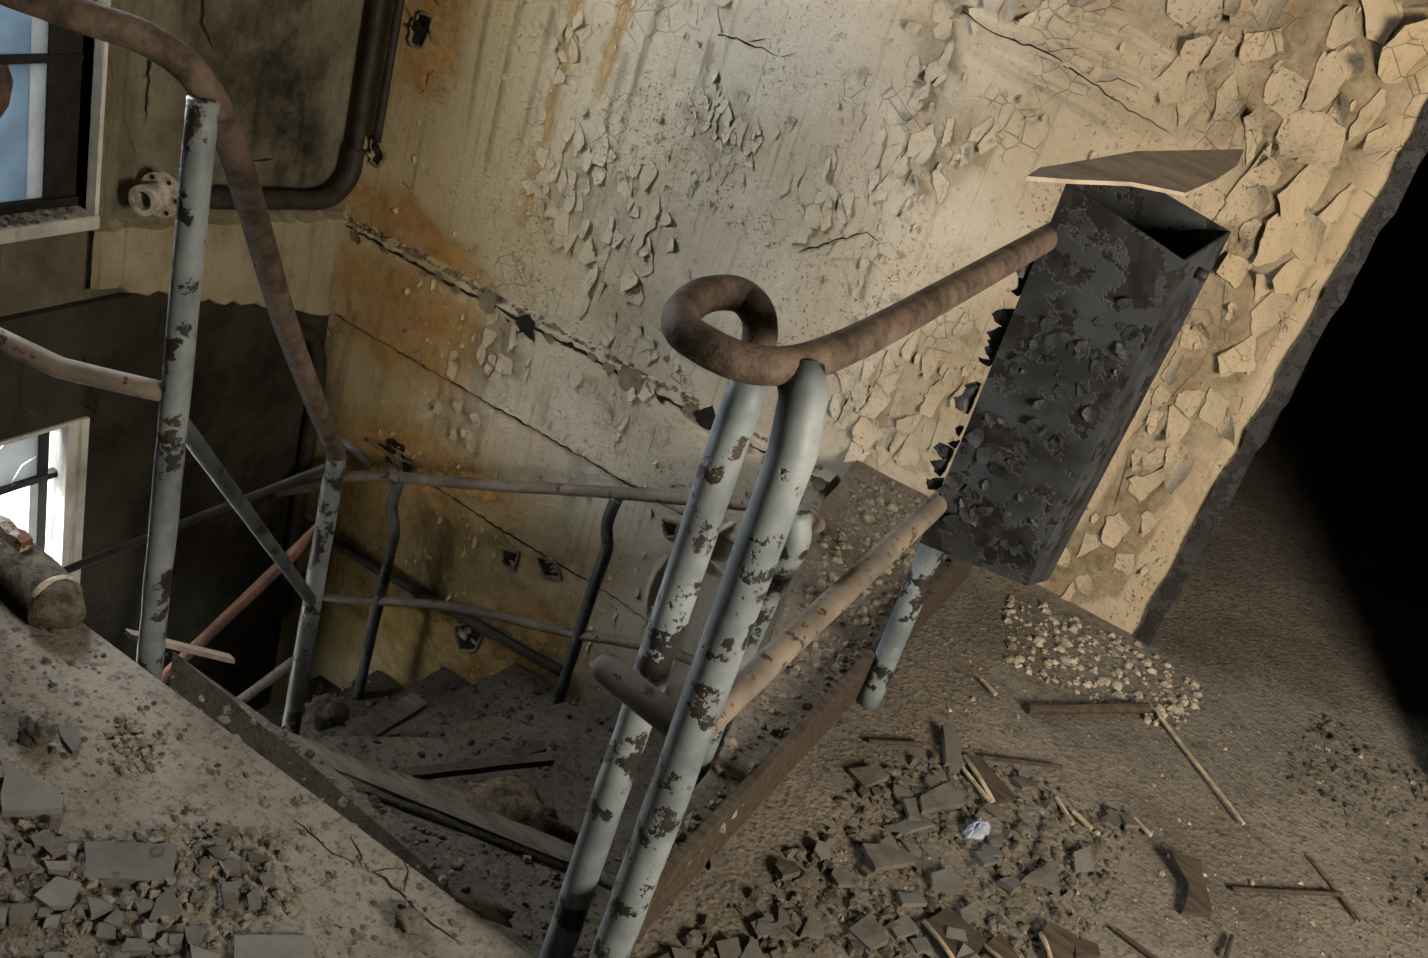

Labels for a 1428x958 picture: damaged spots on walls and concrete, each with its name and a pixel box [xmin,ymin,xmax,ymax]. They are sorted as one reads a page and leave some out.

spalling [407,4,464,51]
corrosion [539,0,579,148]
corrosion [602,0,632,82]
spalling [367,134,386,169]
peeling [467,0,1097,487]
peeling [1050,0,1428,602]
peeling [405,305,551,429]
spalling [365,429,423,473]
peeling [422,391,496,499]
water stain [330,468,577,685]
spalling [626,505,680,551]